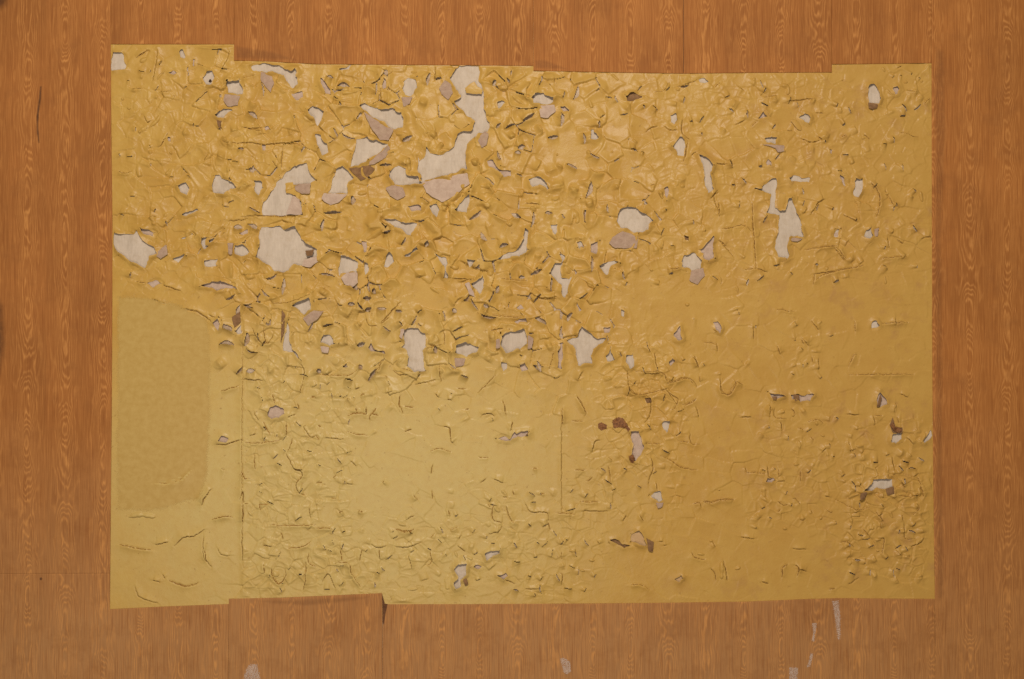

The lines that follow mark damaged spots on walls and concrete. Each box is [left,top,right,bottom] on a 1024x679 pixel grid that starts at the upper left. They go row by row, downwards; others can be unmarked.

peeling [281,298,324,364]
peeling [113,63,508,299]
crack [119,328,530,603]
peeling [368,326,430,375]
peeling [496,305,533,374]
crack [480,396,644,534]
peeling [547,202,656,370]
peeling [668,113,717,193]
peeling [678,233,718,284]
crack [627,330,850,491]
peeling [755,135,814,262]
crack [745,459,924,551]